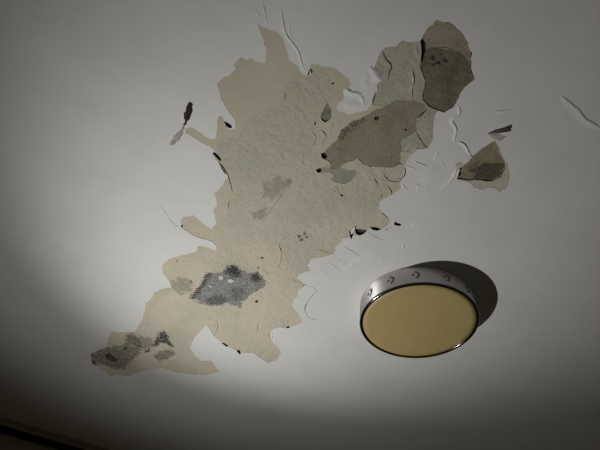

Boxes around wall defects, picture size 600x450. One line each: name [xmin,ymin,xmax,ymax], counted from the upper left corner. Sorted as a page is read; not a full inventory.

flaking render [456,133,510,191]
peeling [90,20,475,376]
water stain [171,265,266,308]
water stain [92,331,175,370]